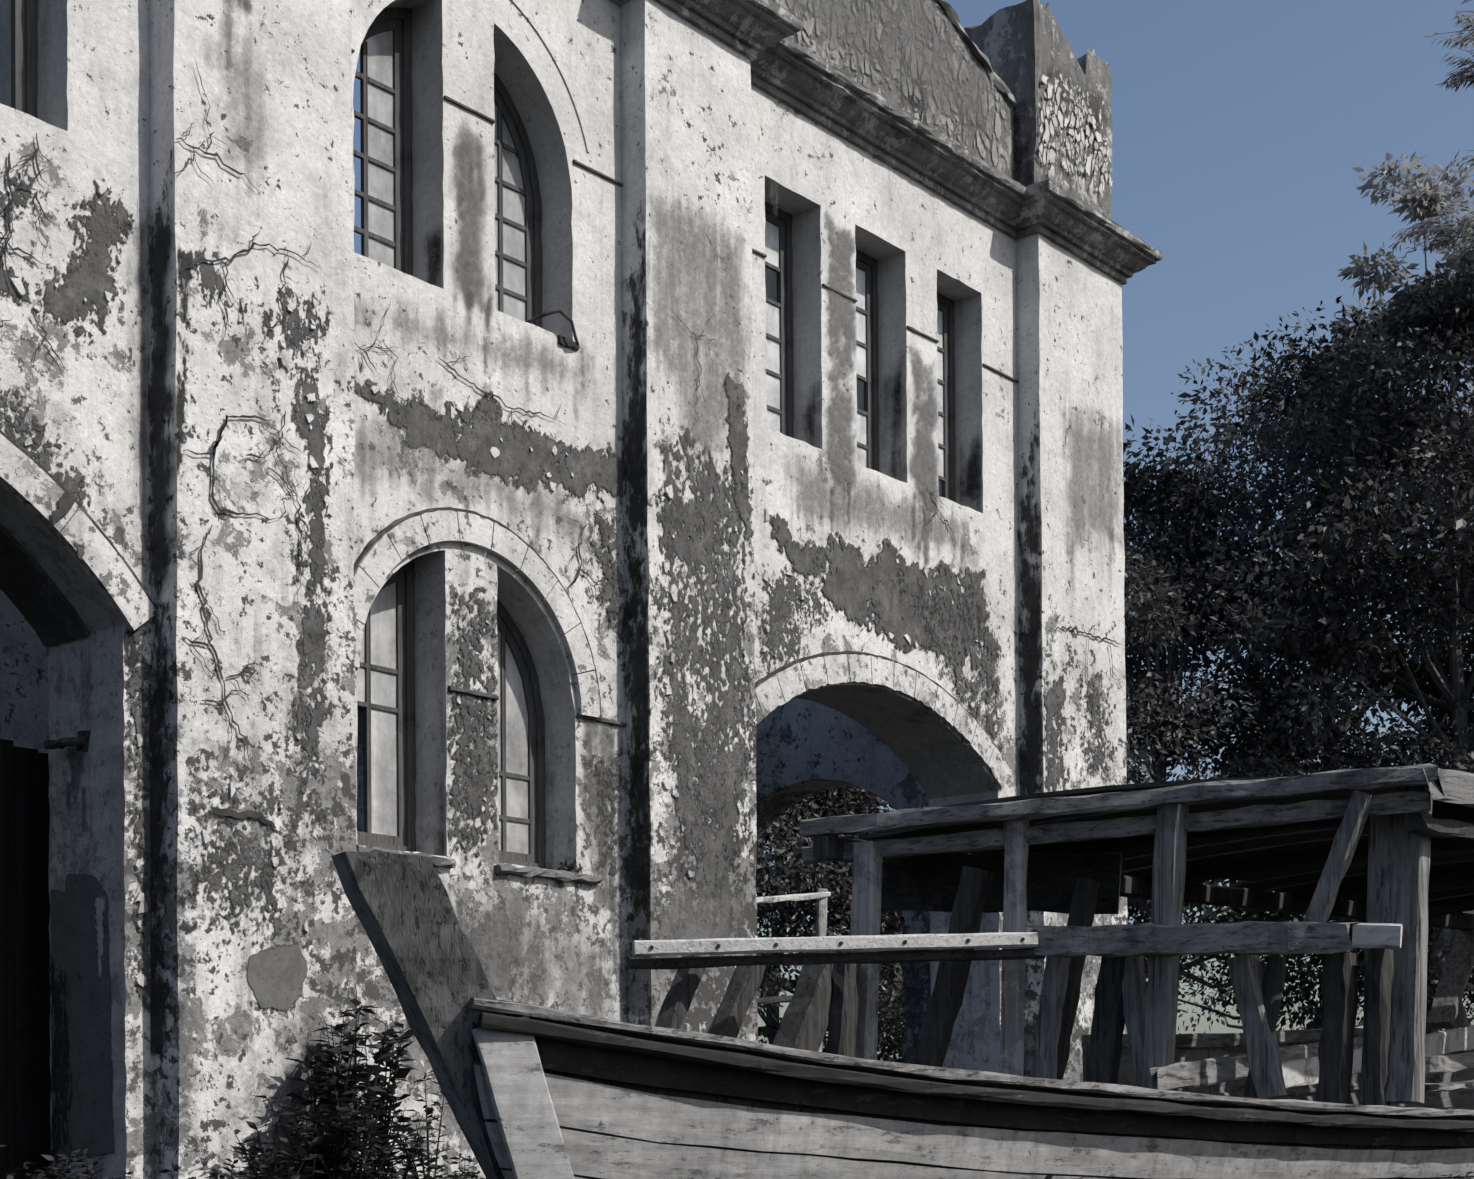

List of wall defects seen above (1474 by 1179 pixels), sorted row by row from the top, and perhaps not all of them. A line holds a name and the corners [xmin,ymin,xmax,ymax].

crack [0,133,64,369]
flaking render [0,165,134,346]
crack [163,58,262,192]
crack [181,231,321,344]
damp [426,128,491,326]
damp [484,340,563,375]
damp [655,205,745,447]
flaking render [170,248,335,1011]
crack [183,411,326,828]
flaking render [354,362,625,642]
flaking render [649,366,1006,911]
damp [661,891,740,957]